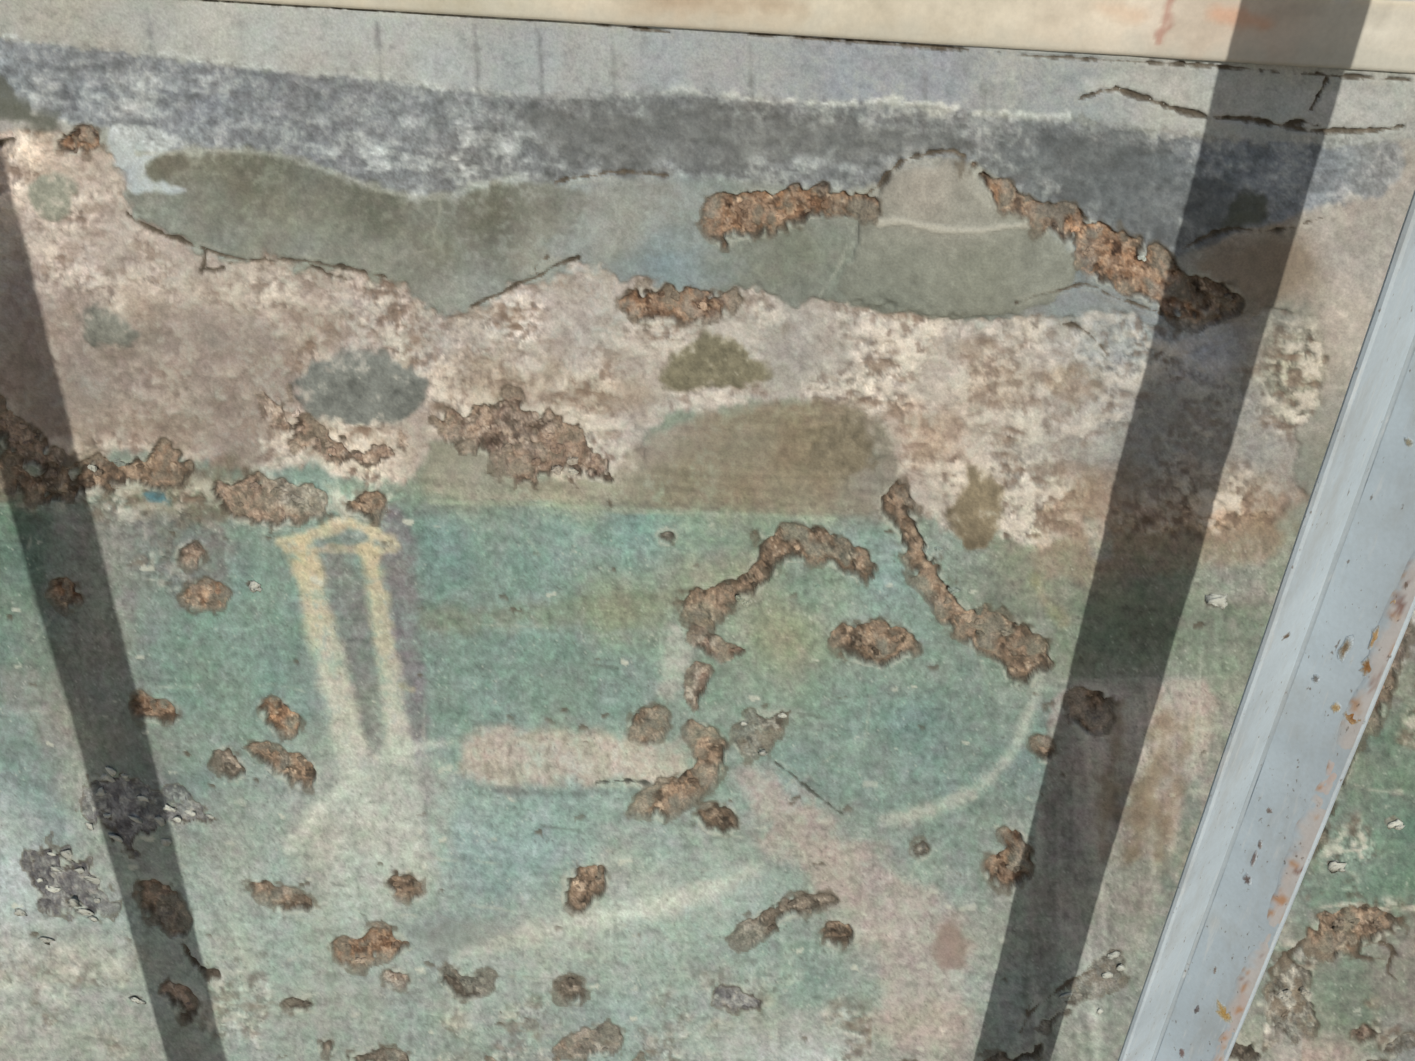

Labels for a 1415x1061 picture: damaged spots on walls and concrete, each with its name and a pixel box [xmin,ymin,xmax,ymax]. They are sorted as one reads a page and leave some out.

crack [186,0,670,33]
crack [747,32,1412,136]
flaking render [0,117,1326,691]
spalling [206,693,318,795]
spalling [624,521,879,839]
spalling [1060,684,1119,740]
peeling [75,767,217,859]
peeling [13,831,223,1027]
spalling [548,972,593,1008]
spalling [550,1018,646,1061]
spalling [725,886,863,954]
spalling [1261,895,1410,1044]